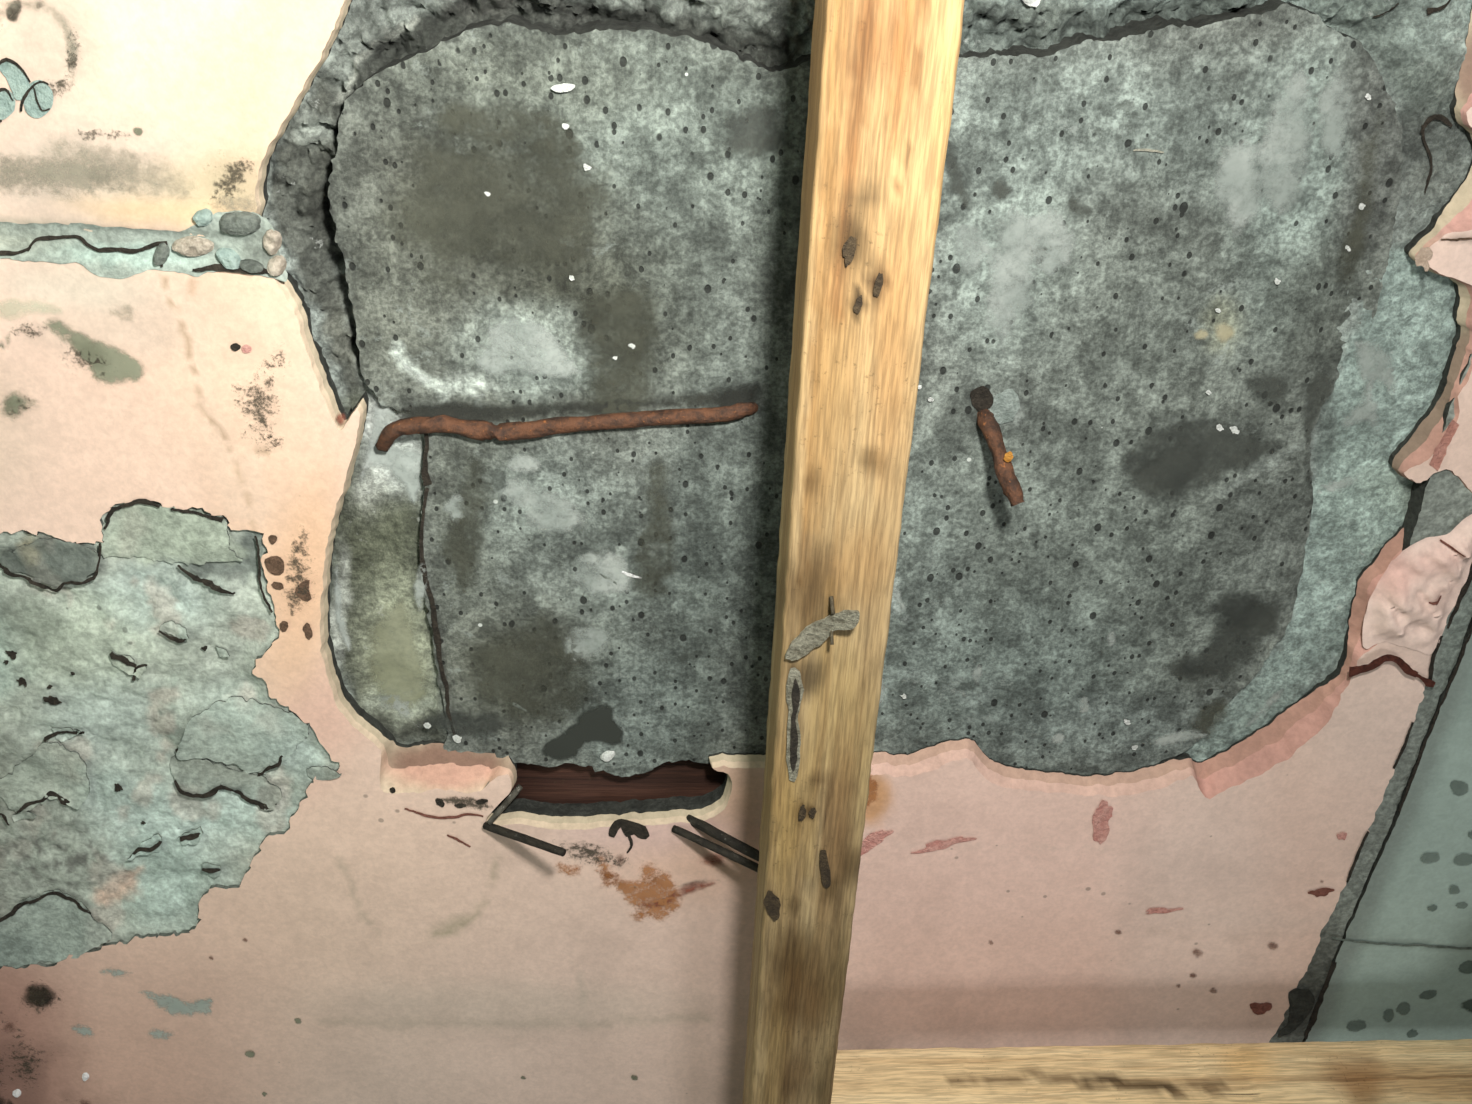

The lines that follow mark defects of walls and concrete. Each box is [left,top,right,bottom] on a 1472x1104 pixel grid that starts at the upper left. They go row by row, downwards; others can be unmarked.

peeling [0,58,54,122]
water stain [402,107,604,277]
water stain [477,291,653,414]
spalling [255,0,815,853]
rust [375,403,758,452]
rust [970,386,1024,507]
spalling [871,0,1472,845]
water stain [1125,419,1278,496]
crack [419,433,455,735]
peeling [0,499,342,968]
rust [559,843,713,921]
water stain [26,981,61,1012]